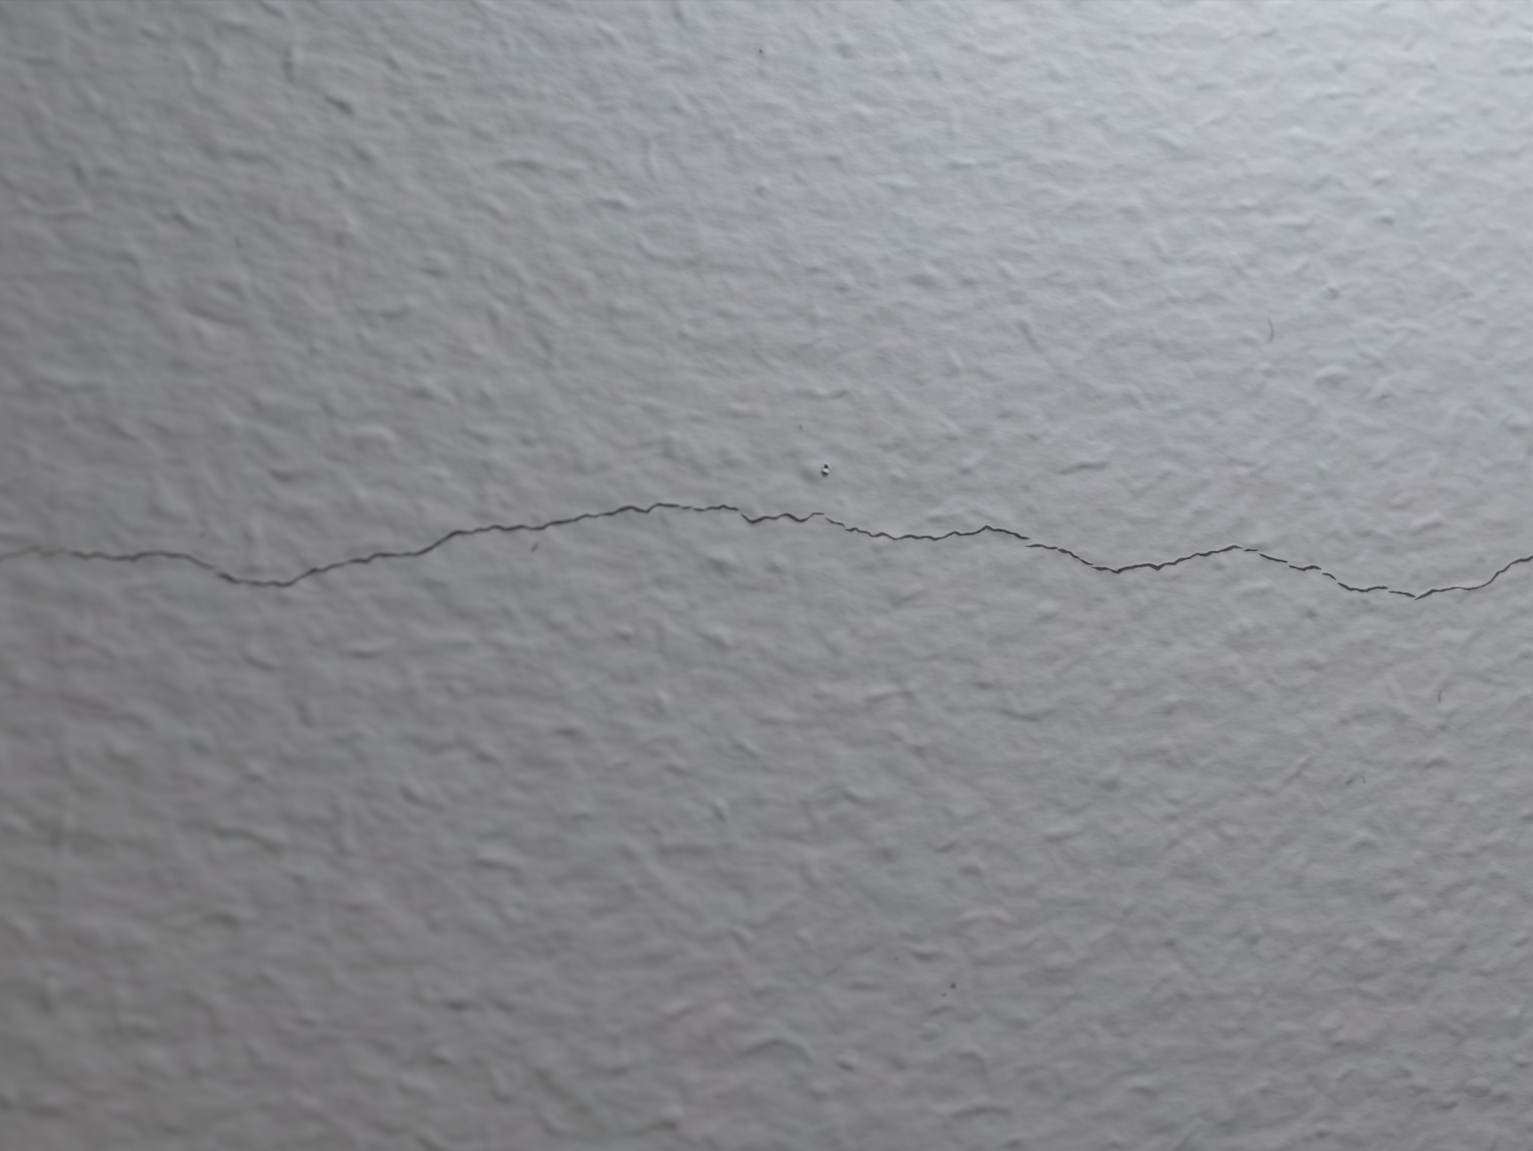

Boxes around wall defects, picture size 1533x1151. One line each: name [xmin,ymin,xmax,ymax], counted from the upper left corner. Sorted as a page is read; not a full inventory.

crack [0,501,1533,602]